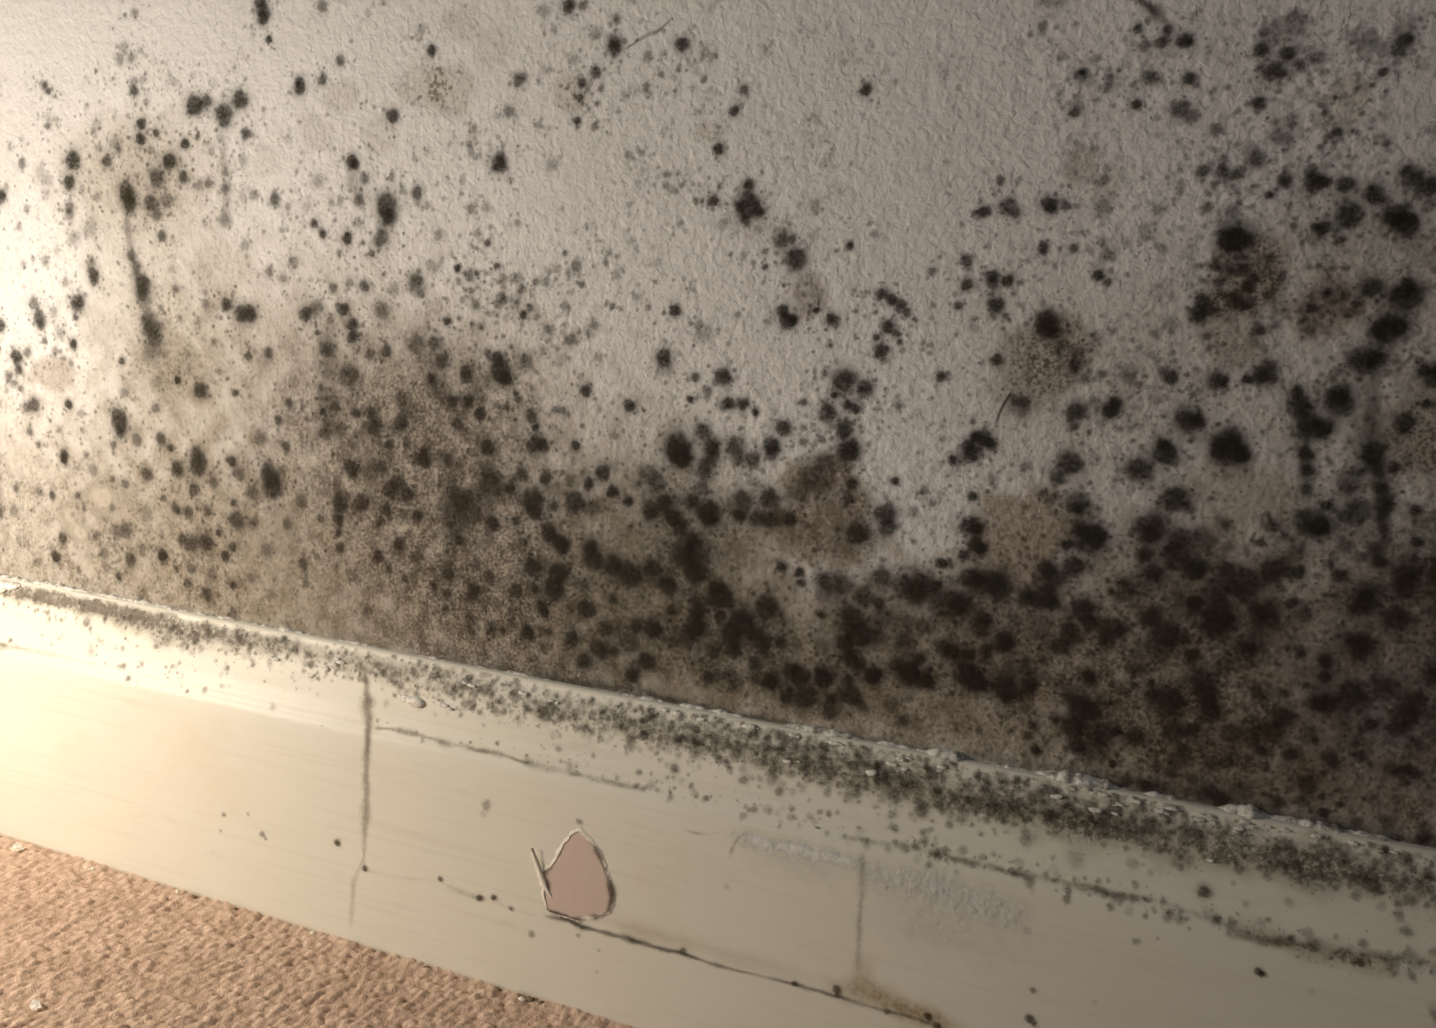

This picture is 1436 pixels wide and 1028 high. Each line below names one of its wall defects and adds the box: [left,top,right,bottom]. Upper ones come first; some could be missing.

leakage [187,91,249,139]
leakage [64,151,80,209]
leakage [119,136,199,241]
leakage [346,155,396,255]
leakage [736,179,764,220]
leakage [1303,167,1418,243]
leakage [71,268,98,320]
leakage [222,299,256,322]
leakage [0,299,1436,900]
crack [364,697,372,757]
peeling [531,827,615,923]
crack [559,917,694,958]